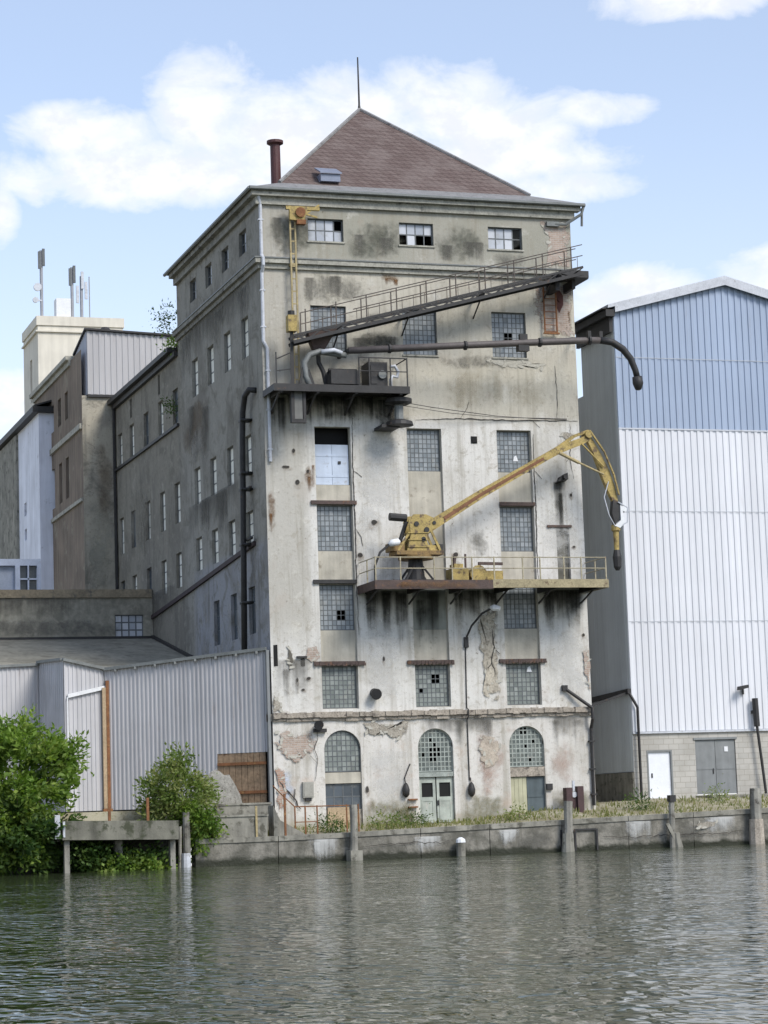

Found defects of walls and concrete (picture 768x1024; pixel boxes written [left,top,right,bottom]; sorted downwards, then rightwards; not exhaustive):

flaking render [540,220,570,267]
flaking render [535,287,575,338]
leakage [366,593,424,621]
leakage [545,593,555,615]
leakage [568,592,579,611]
flaking render [273,645,311,691]
crack [488,631,500,672]
flaking render [364,720,409,741]
flaking render [274,731,316,809]